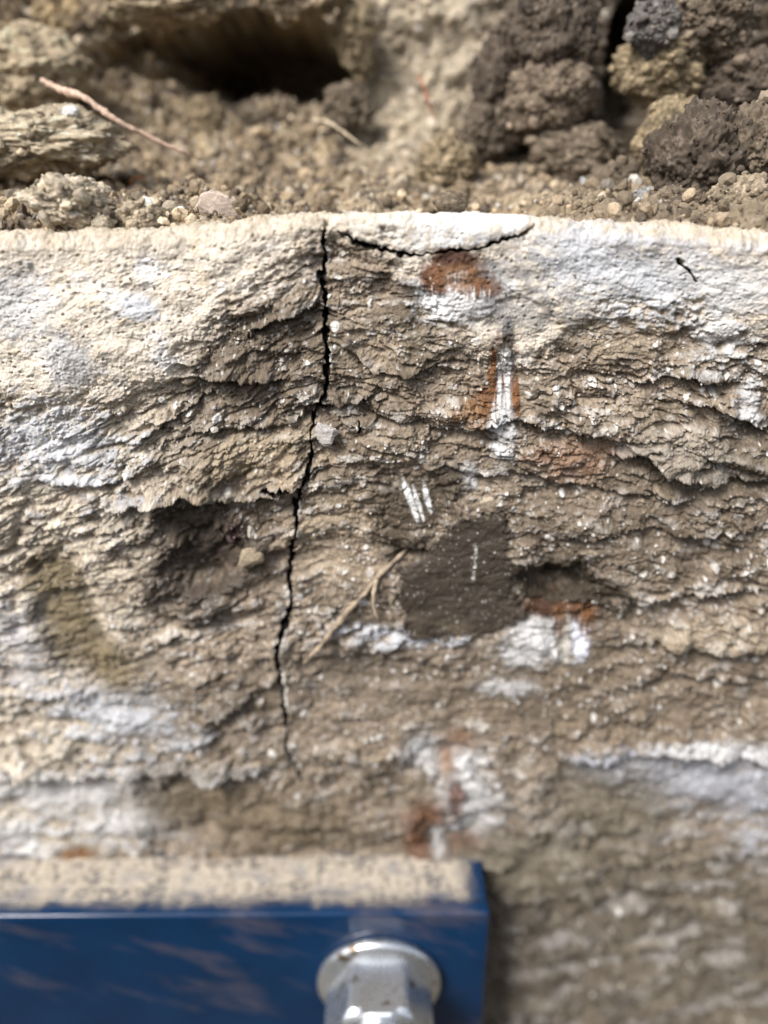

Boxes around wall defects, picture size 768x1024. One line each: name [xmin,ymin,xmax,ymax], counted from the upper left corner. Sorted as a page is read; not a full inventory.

water stain [0,269,53,345]
water stain [110,293,159,322]
rust [407,247,507,327]
water stain [530,228,768,369]
rust [472,321,520,425]
crack [261,231,525,780]
water stain [336,463,632,651]
rust [524,592,598,637]